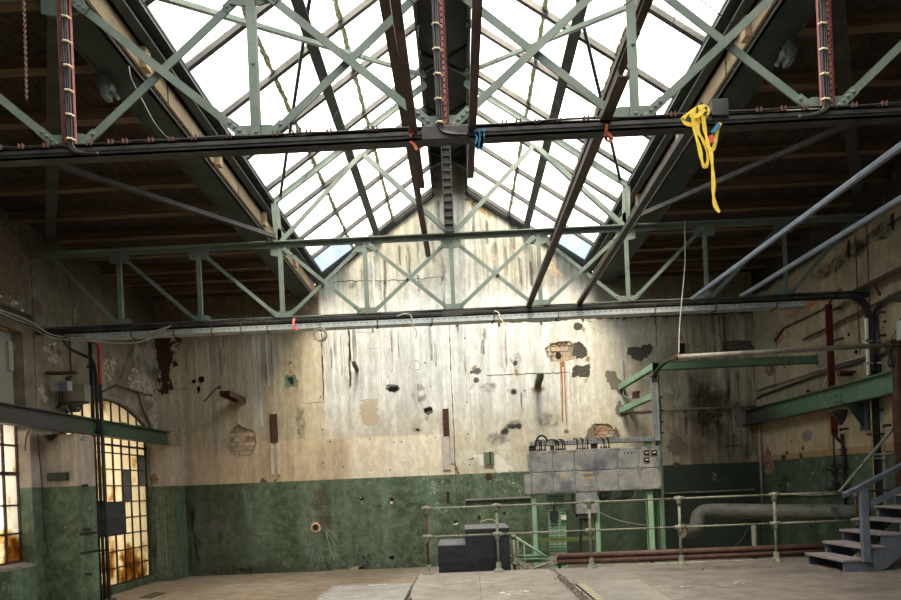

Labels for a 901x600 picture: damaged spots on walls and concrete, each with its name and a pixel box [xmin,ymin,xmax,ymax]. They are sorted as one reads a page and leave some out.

leakage [372,257,386,312]
flaking render [544,341,574,362]
flaking render [227,423,257,456]
corrosion [560,361,569,434]
flaking render [594,423,616,439]
leakage [671,368,748,458]